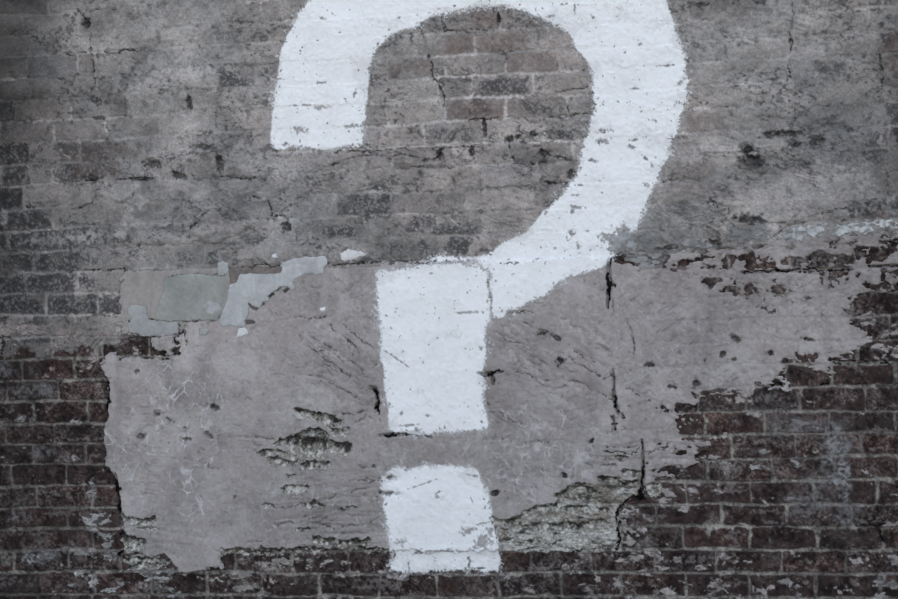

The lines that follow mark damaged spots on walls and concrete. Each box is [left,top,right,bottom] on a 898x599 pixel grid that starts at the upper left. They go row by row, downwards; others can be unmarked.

peeling [217,249,380,338]
crack [332,259,381,267]
crack [605,247,678,354]
peeling [607,215,898,269]
flaking render [871,324,898,358]
crack [333,387,380,421]
spalling [208,527,389,599]
spalling [256,407,359,512]
crack [259,432,429,543]
crack [451,374,667,550]
spalling [489,445,698,599]
flaking render [866,571,898,599]